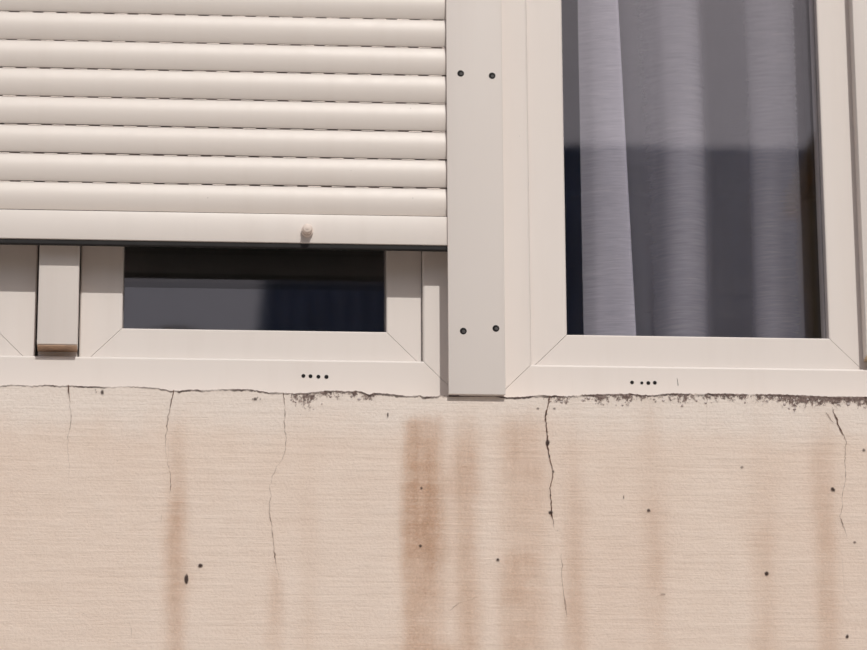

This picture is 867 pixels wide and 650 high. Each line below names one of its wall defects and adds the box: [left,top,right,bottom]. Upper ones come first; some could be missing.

crack [3,385,103,397]
crack [132,386,685,524]
crack [767,394,859,458]